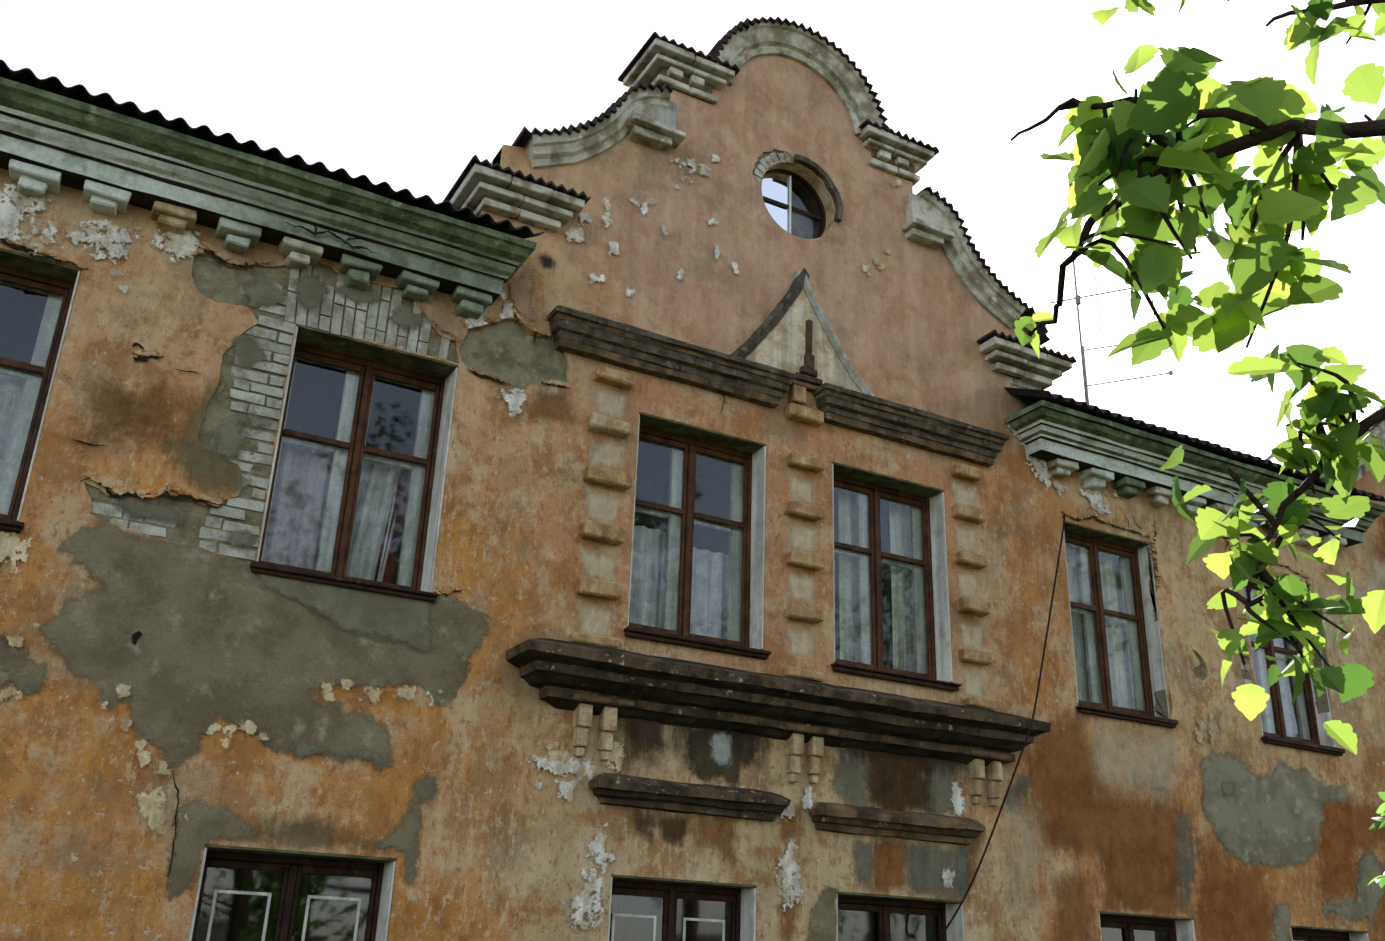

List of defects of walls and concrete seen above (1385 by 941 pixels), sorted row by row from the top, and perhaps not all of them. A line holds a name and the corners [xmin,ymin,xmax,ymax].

peeling [670,154,720,189]
peeling [565,198,620,257]
spalling [0,179,567,563]
peeling [0,684,22,708]
peeling [100,684,131,709]
peeling [321,679,443,706]
peeling [206,719,270,749]
peeling [119,717,188,852]
peeling [527,735,631,803]
peeling [781,784,816,821]
peeling [560,822,617,932]
peeling [776,838,805,911]